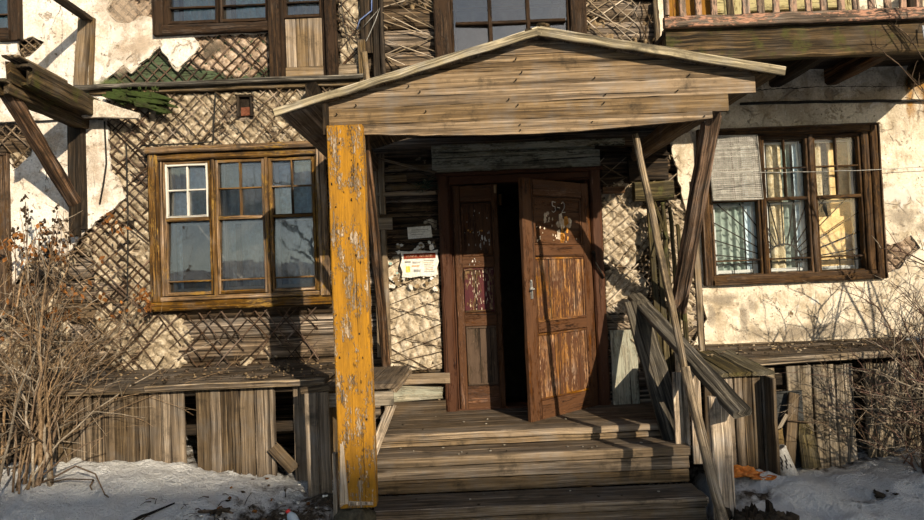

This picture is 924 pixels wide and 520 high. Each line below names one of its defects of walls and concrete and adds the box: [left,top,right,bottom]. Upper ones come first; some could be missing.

flaking render [106,0,152,49]
flaking render [17,36,46,58]
flaking render [102,33,270,84]
corrosion [904,79,924,114]
flaking render [0,88,319,375]
flaking render [887,235,920,272]
leakage [786,324,850,338]